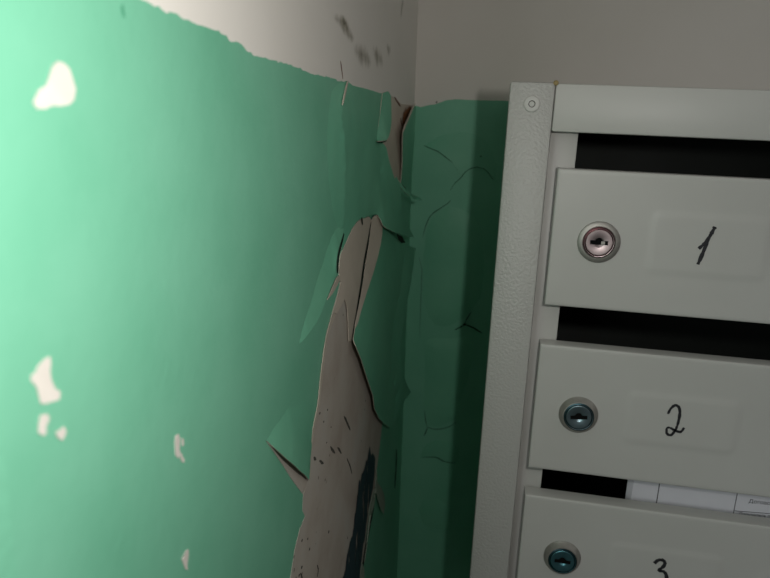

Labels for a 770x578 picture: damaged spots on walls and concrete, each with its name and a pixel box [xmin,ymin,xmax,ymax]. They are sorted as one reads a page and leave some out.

peeling [32,61,76,109]
peeling [290,81,422,578]
peeling [30,356,61,404]
peeling [38,414,67,440]
peeling [174,434,185,463]